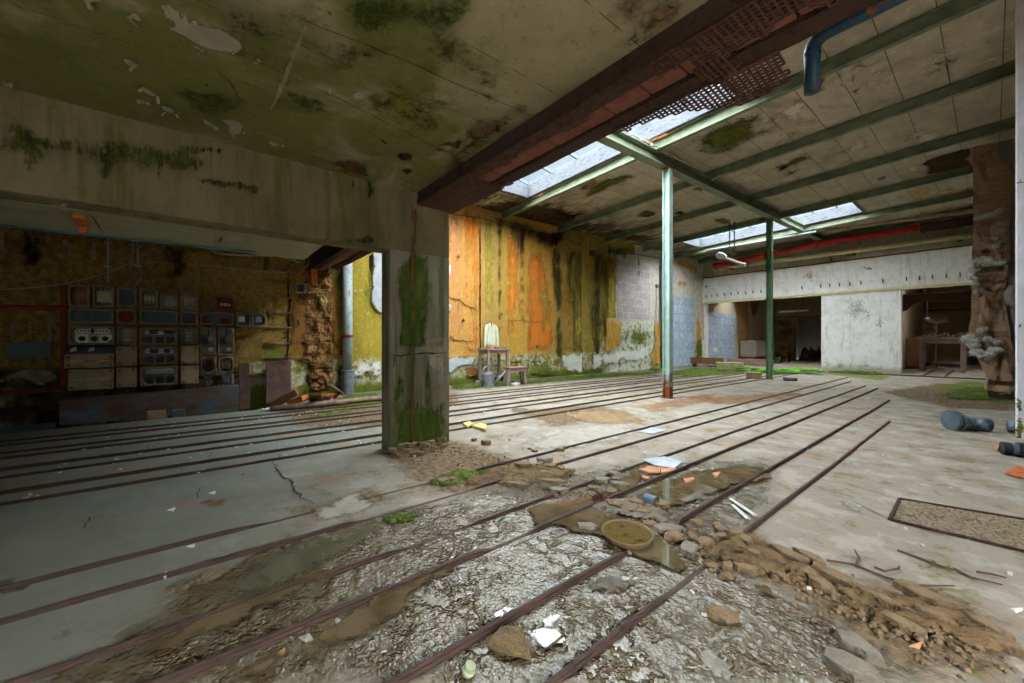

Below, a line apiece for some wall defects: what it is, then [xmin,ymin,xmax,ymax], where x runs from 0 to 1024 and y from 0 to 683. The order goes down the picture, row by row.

peeling [161,4,242,56]
damp [481,201,654,358]
flaking render [297,260,334,390]
peeling [562,317,649,373]
crack [272,454,315,504]